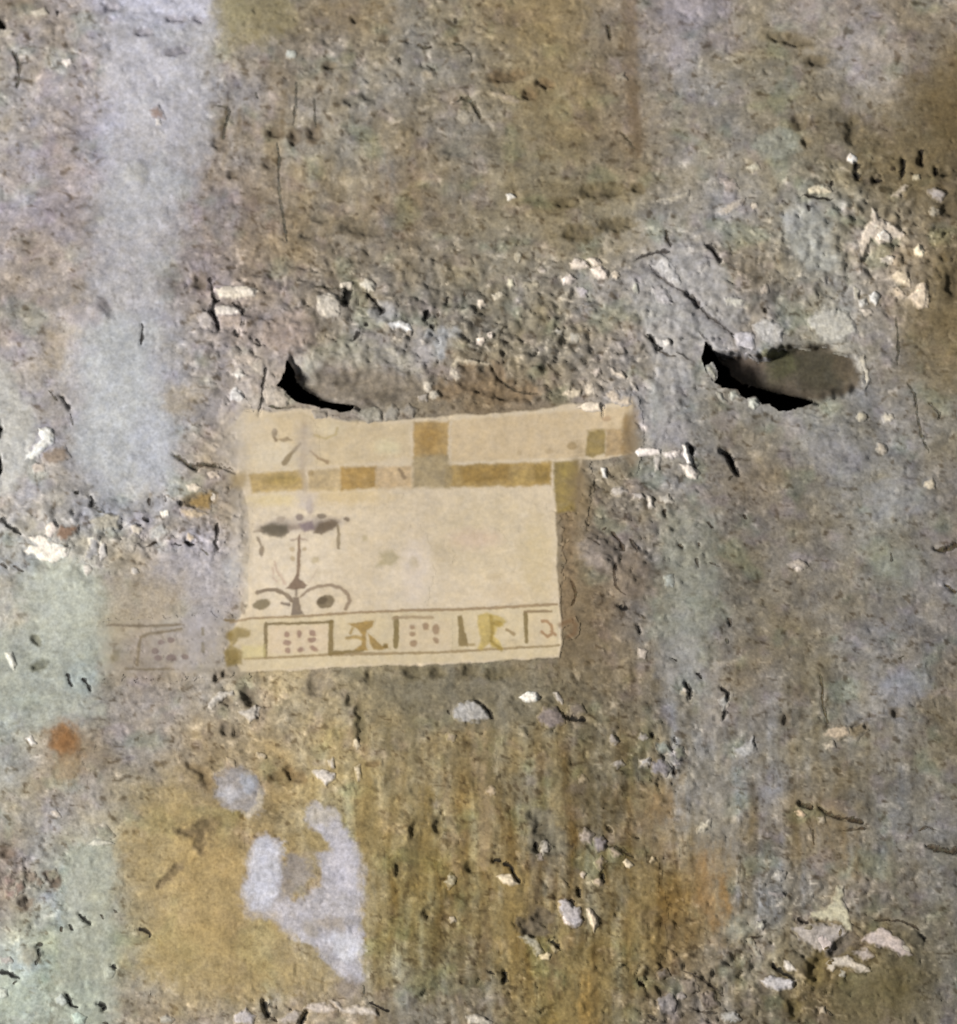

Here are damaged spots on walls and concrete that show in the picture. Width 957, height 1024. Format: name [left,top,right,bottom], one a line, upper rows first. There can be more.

flaking render [632,256,682,306]
spalling [701,207,930,411]
flaking render [229,351,261,402]
spalling [264,360,440,424]